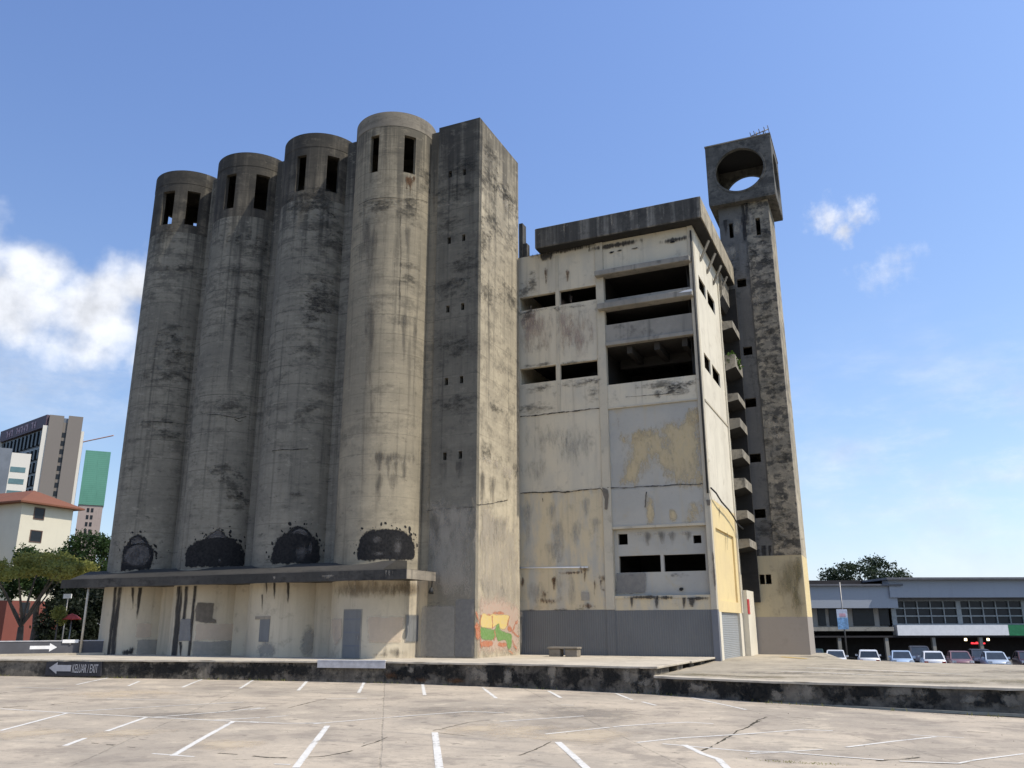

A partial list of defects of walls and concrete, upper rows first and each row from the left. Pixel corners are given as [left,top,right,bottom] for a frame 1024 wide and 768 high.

peeling [622,410,703,486]
damp [107,587,142,655]
damp [127,586,311,680]
damp [391,664,468,684]
damp [482,665,543,687]
damp [556,667,783,702]
damp [811,686,880,705]
damp [899,675,968,709]
damp [970,680,1024,707]